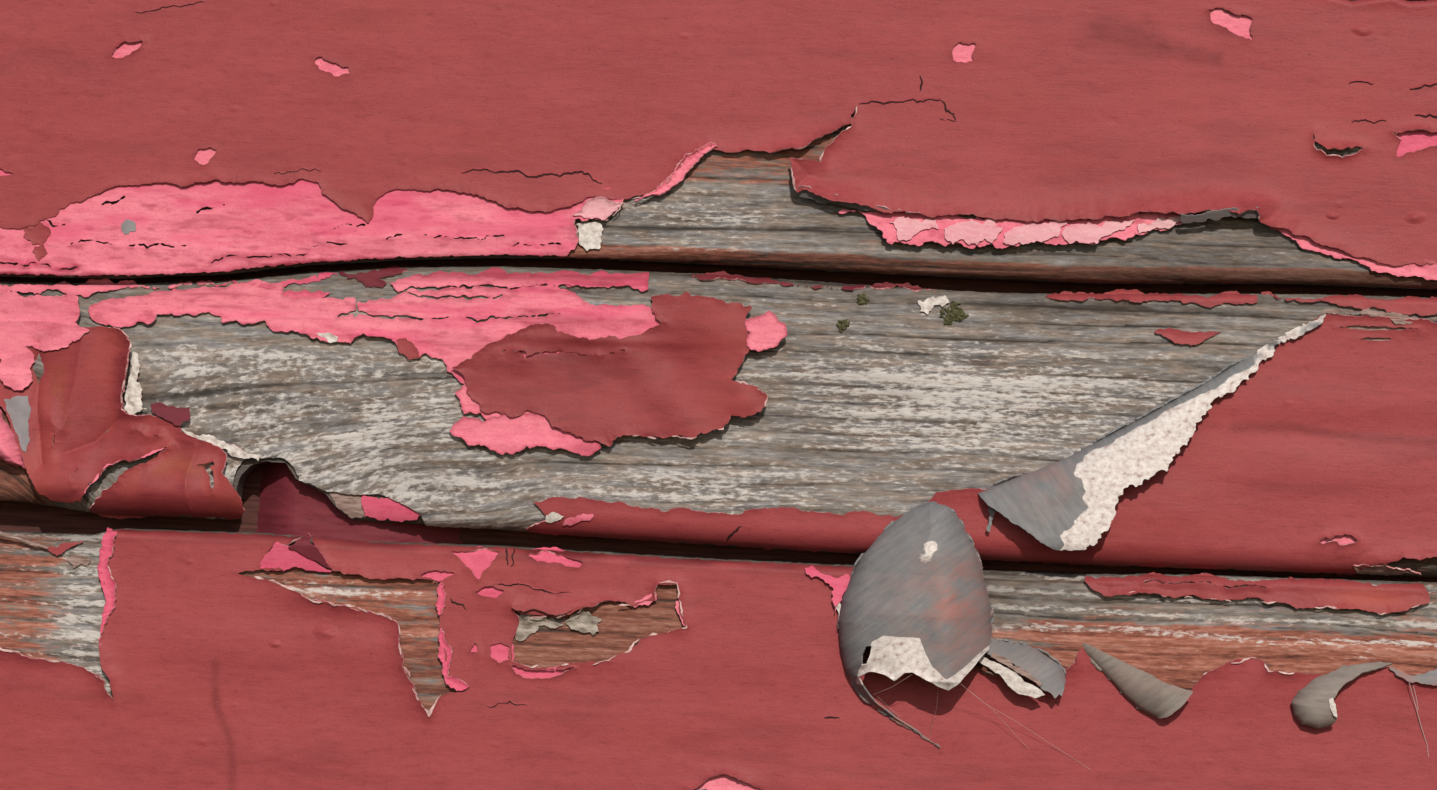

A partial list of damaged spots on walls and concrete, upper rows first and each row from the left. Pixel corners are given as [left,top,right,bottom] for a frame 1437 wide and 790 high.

peeling [0,124,1437,748]
peeling [695,775,762,790]